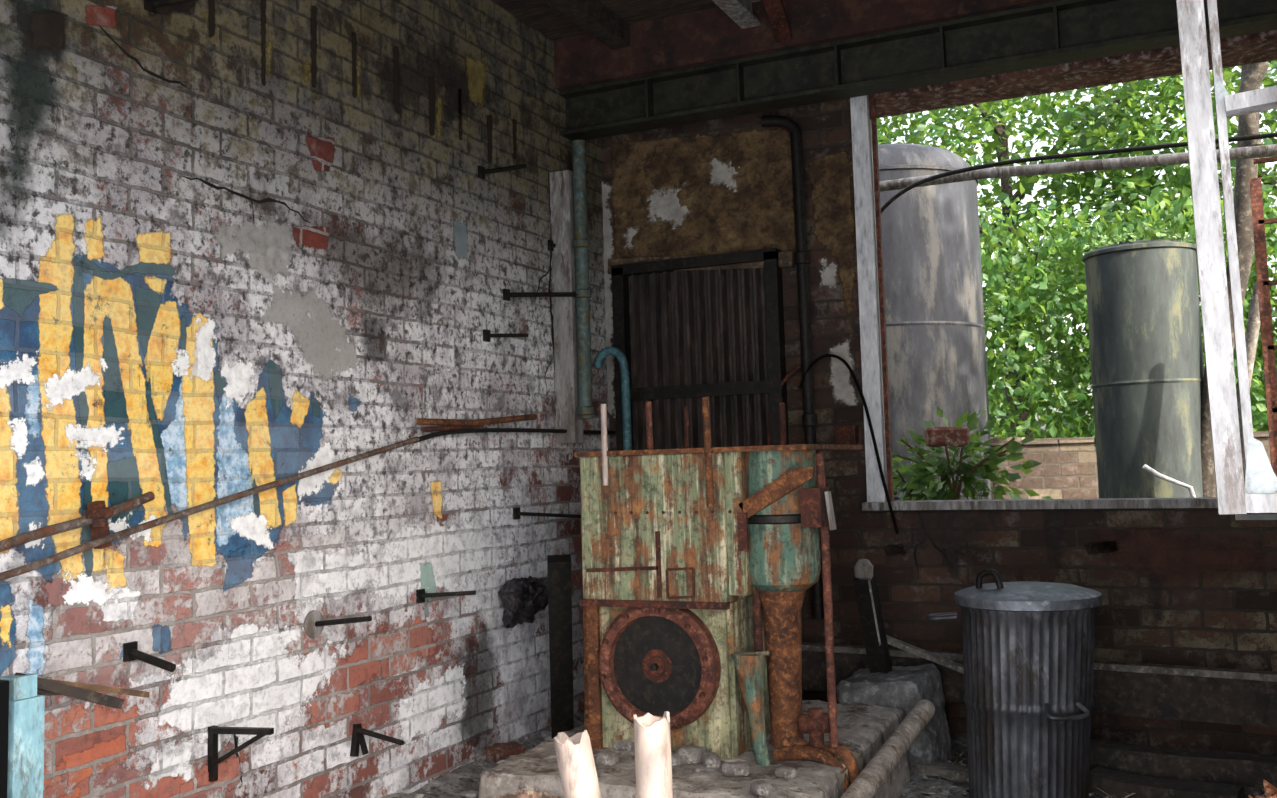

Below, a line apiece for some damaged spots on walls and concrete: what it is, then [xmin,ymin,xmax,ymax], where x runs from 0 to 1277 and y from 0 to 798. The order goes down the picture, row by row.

crack [98,25,186,88]
crack [182,176,311,225]
peeling [710,158,739,192]
spalling [292,226,330,249]
peeling [0,351,108,412]
peeling [171,317,257,410]
peeling [255,286,364,381]
peeling [7,417,47,486]
peeling [64,423,125,481]
peeling [297,442,338,501]
peeling [42,504,437,798]
spalling [488,790,561,798]